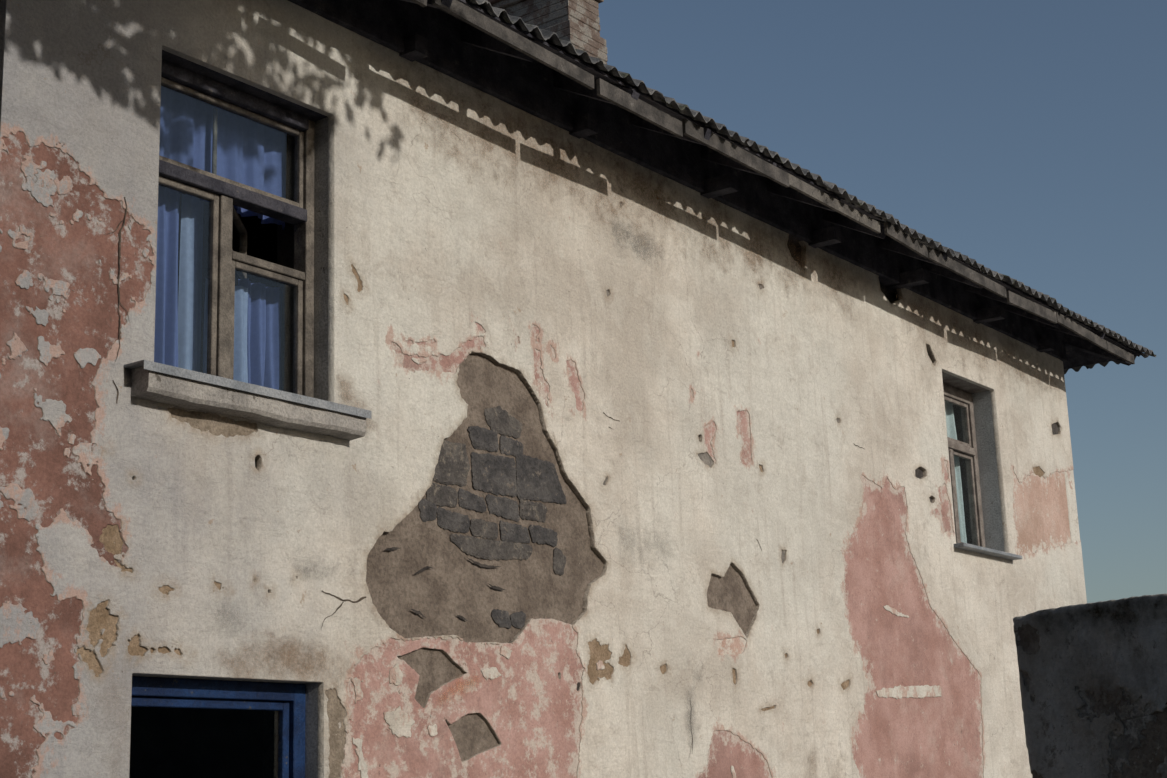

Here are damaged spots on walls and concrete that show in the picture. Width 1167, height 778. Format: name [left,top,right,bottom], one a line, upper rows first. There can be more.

peeling [0,131,181,778]
peeling [929,460,954,533]
peeling [1013,466,1073,555]
spalling [319,322,630,778]
crack [321,591,366,629]
spalling [707,564,756,635]
peeling [844,475,983,778]
peeling [1015,624,1040,655]
peeling [1020,670,1036,702]
peeling [698,730,772,778]
peeling [1112,708,1167,778]